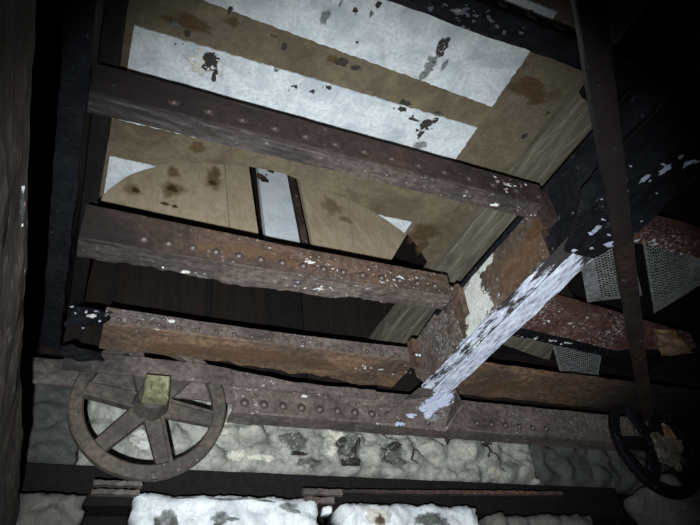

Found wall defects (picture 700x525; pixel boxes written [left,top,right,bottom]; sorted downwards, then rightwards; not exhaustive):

spalling [183,48,226,82]
peeling [419,37,454,81]
water stain [509,77,544,104]
peeling [386,99,444,148]